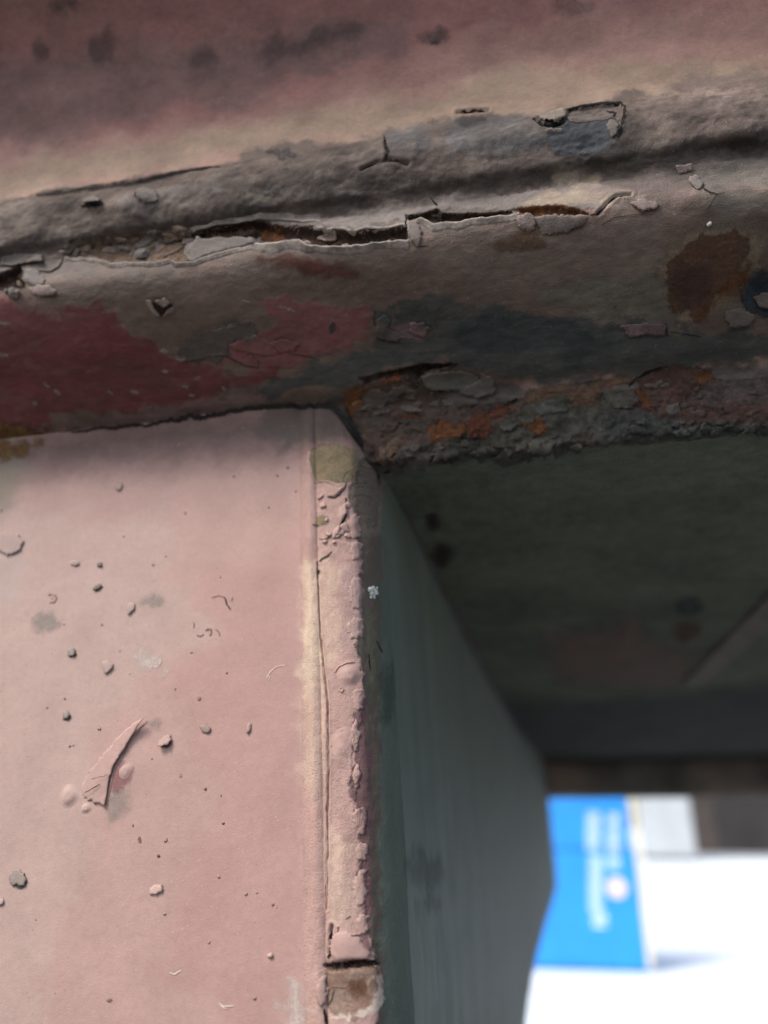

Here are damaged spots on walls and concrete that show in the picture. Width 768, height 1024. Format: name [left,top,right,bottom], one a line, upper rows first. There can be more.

peeling [533,101,628,156]
peeling [675,163,704,189]
peeling [407,220,423,247]
peeling [516,213,589,236]
peeling [602,198,659,225]
peeling [146,297,175,317]
corrosion [659,223,768,329]
corrosion [344,362,518,468]
peeling [347,577,365,639]
peeling [81,718,148,806]
peeling [351,688,366,788]
spalling [315,807,385,1024]